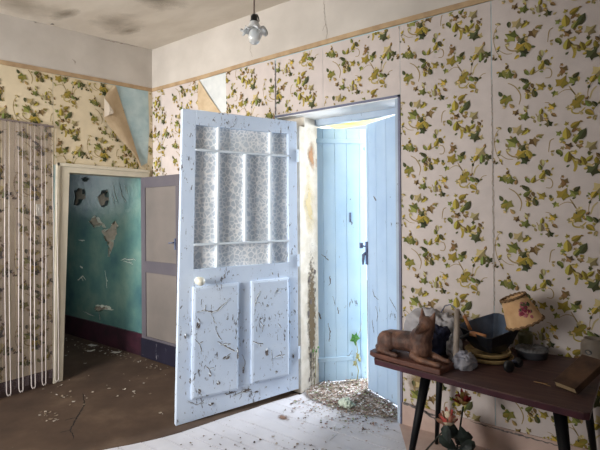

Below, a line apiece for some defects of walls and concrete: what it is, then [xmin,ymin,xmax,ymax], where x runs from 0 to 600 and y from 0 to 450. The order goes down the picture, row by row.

peeling [199,73,226,113]
peeling [74,176,88,206]
peeling [98,189,109,207]
peeling [88,216,118,257]